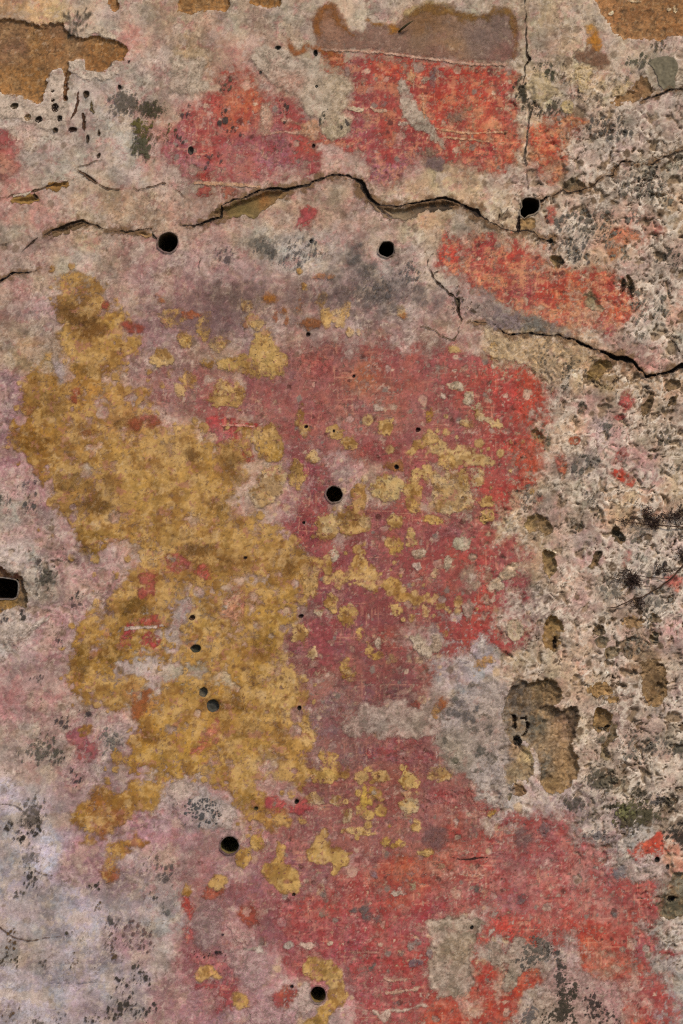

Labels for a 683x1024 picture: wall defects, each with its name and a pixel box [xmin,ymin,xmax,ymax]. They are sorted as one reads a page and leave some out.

flaking render [0,18,130,143]
crack [523,0,532,83]
flaking render [595,0,683,42]
crack [640,88,683,104]
crack [0,160,183,204]
crack [181,109,683,252]
crack [0,216,157,282]
crack [420,253,683,380]
peeling [0,556,50,645]
peeling [391,604,448,658]
peeling [486,562,519,591]
flaking render [301,675,619,849]